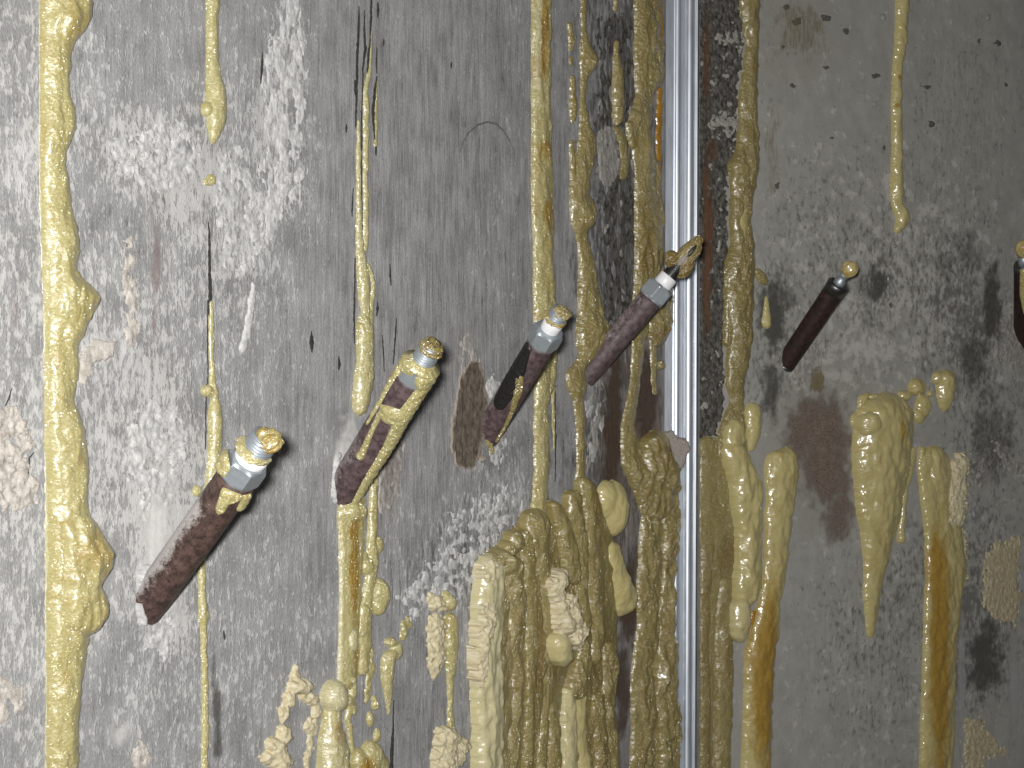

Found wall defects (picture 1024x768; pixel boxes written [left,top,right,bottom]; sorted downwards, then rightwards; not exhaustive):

crack [351,0,378,230]
crack [204,222,212,450]
crack [350,258,358,344]
spalling [450,333,508,470]
leakage [958,625,1018,736]